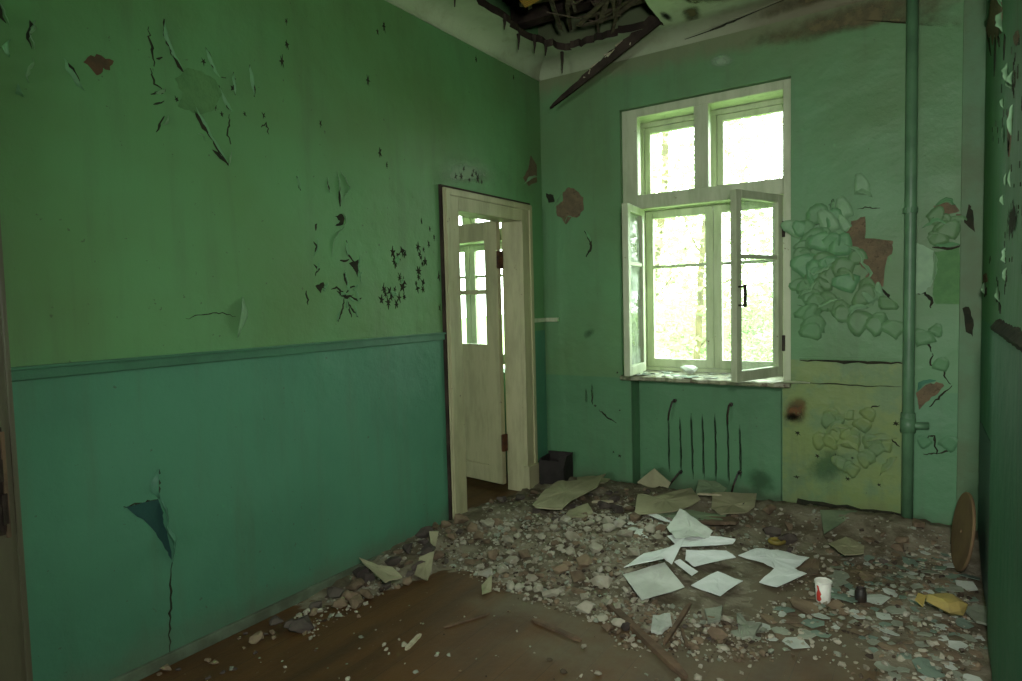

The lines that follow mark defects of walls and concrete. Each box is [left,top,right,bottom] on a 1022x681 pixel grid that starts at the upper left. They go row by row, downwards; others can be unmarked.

water stain [684,0,709,20]
spalling [64,54,114,91]
spalling [984,0,1022,205]
peeling [305,172,363,322]
spalling [546,187,584,224]
spalling [780,173,903,341]
spalling [981,235,1012,314]
spalling [915,323,952,409]